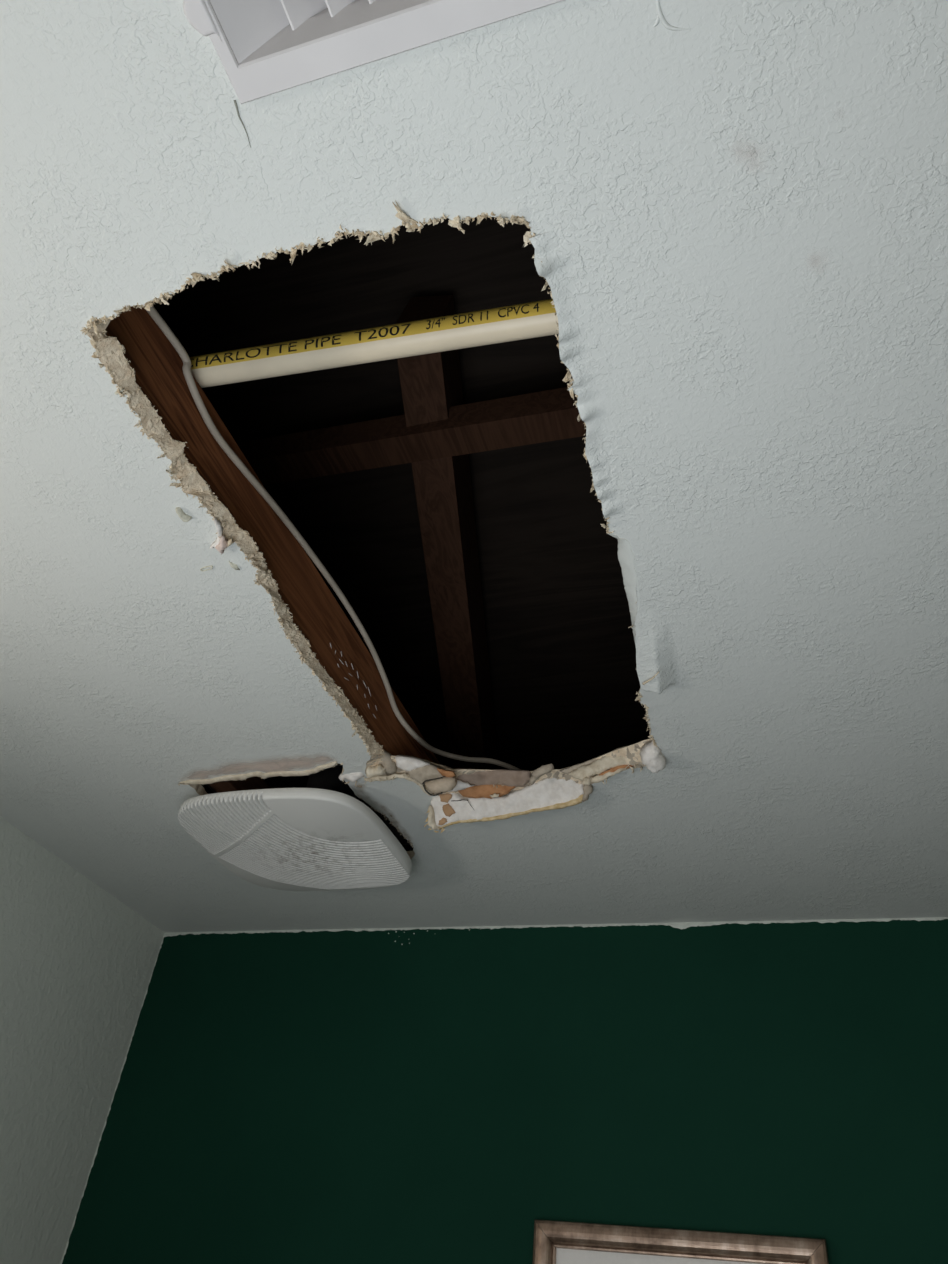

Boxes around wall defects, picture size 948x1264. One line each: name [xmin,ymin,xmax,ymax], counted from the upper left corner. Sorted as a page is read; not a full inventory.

spalling [81,202,626,775]
spalling [506,688,657,795]